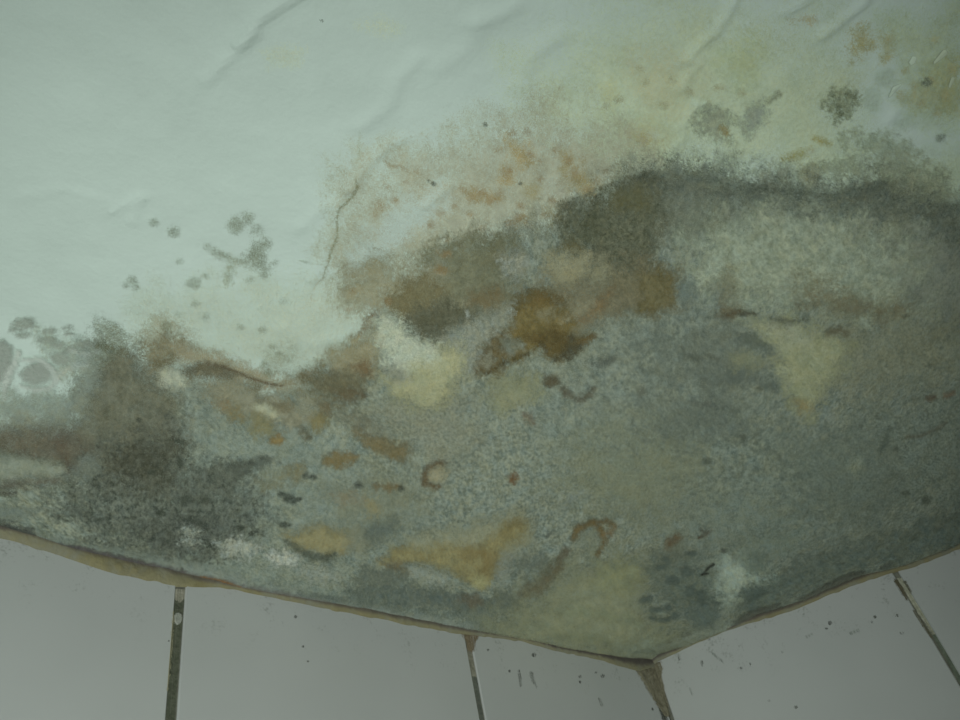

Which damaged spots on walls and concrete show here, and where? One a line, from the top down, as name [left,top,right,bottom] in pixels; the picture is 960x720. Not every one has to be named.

crack [301,138,361,307]
damp [165,588,185,720]
damp [894,578,960,683]